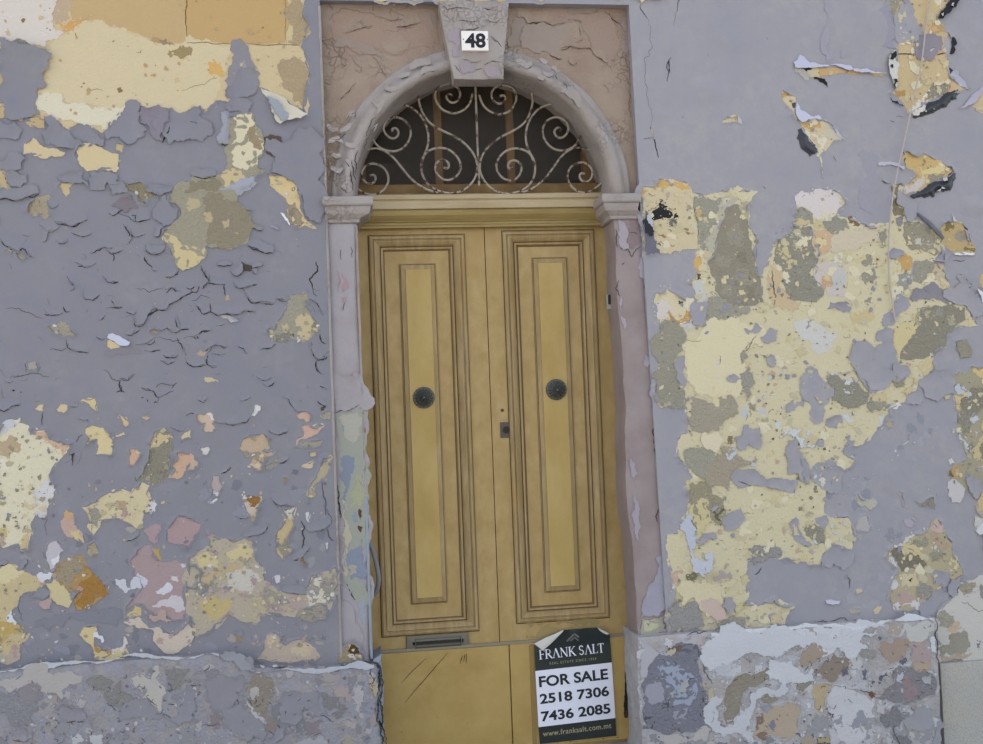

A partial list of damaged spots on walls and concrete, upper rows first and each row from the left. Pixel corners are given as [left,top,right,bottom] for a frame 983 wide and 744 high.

peeling [514,0,596,81]
crack [603,0,680,158]
peeling [816,67,884,78]
peeling [889,0,966,114]
flaking render [0,0,359,277]
peeling [783,90,842,173]
peeling [618,220,629,250]
peeling [104,279,198,358]
flaking render [265,292,320,344]
peeling [81,398,129,455]
peeling [640,151,983,744]
peeling [0,408,372,726]